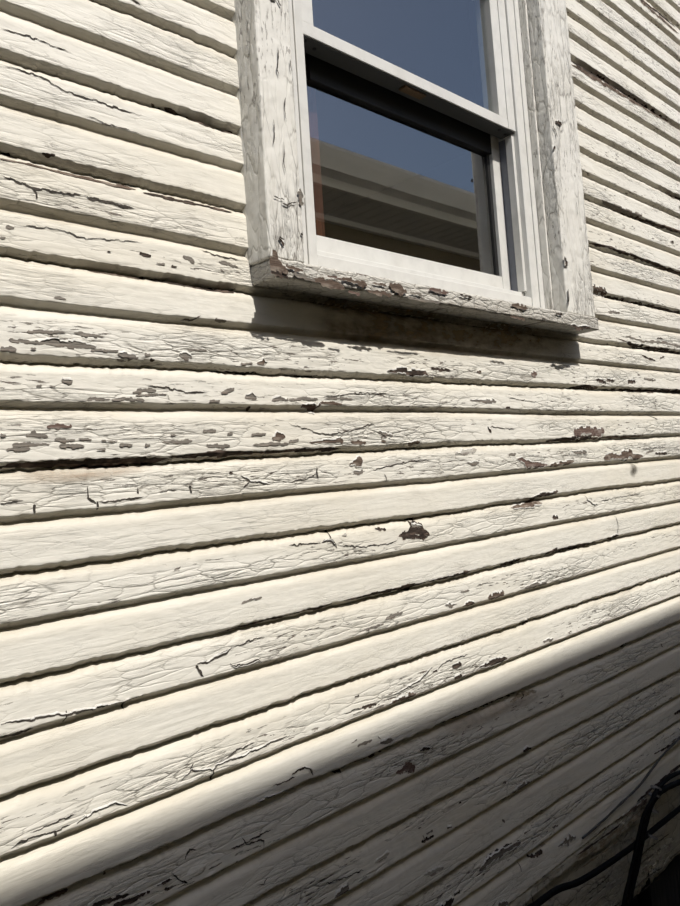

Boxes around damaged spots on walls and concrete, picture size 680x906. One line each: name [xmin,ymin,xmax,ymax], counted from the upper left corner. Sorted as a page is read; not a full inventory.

peeling [0,329,155,362]
crack [213,369,257,377]
peeling [87,384,234,402]
peeling [272,392,384,414]
peeling [0,423,133,452]
peeling [251,424,429,475]
crack [87,485,192,509]
crack [292,530,395,548]
peeling [399,517,430,541]
crack [196,637,262,677]
crack [184,735,289,779]
crack [14,801,127,847]